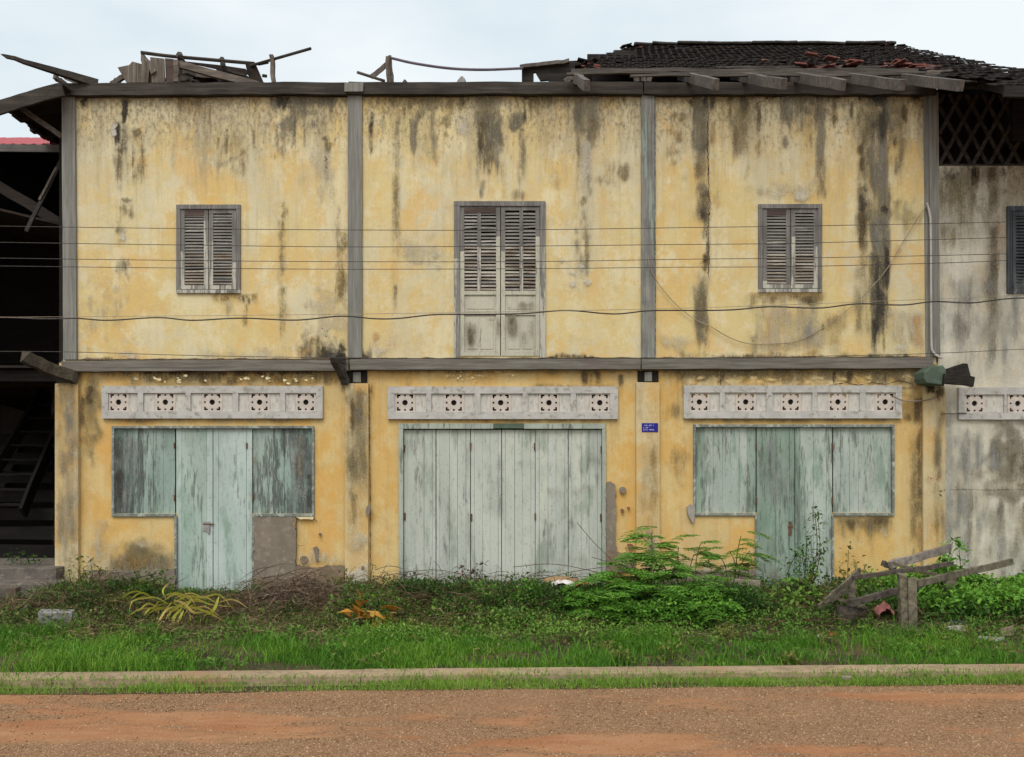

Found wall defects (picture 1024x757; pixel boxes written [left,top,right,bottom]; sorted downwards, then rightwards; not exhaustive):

damp [114,100,141,179]
damp [392,96,601,200]
damp [661,96,921,385]
damp [940,166,1005,245]
damp [943,226,1019,359]
damp [341,385,372,478]
damp [905,386,1024,574]